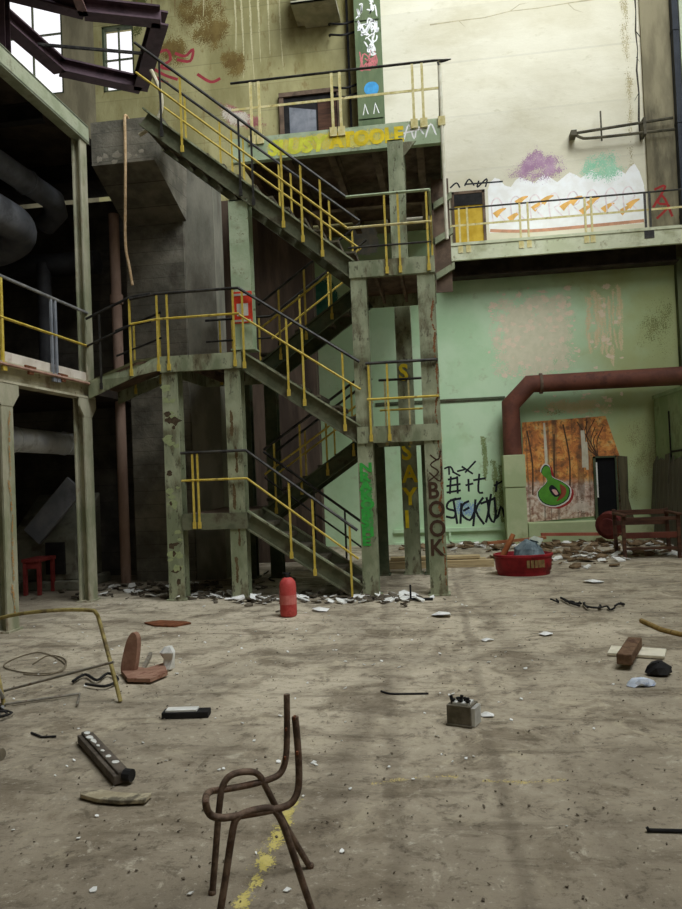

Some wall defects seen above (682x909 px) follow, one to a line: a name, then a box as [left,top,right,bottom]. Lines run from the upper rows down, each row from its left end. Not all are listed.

damp [159,0,284,96]
peeling [484,283,624,381]